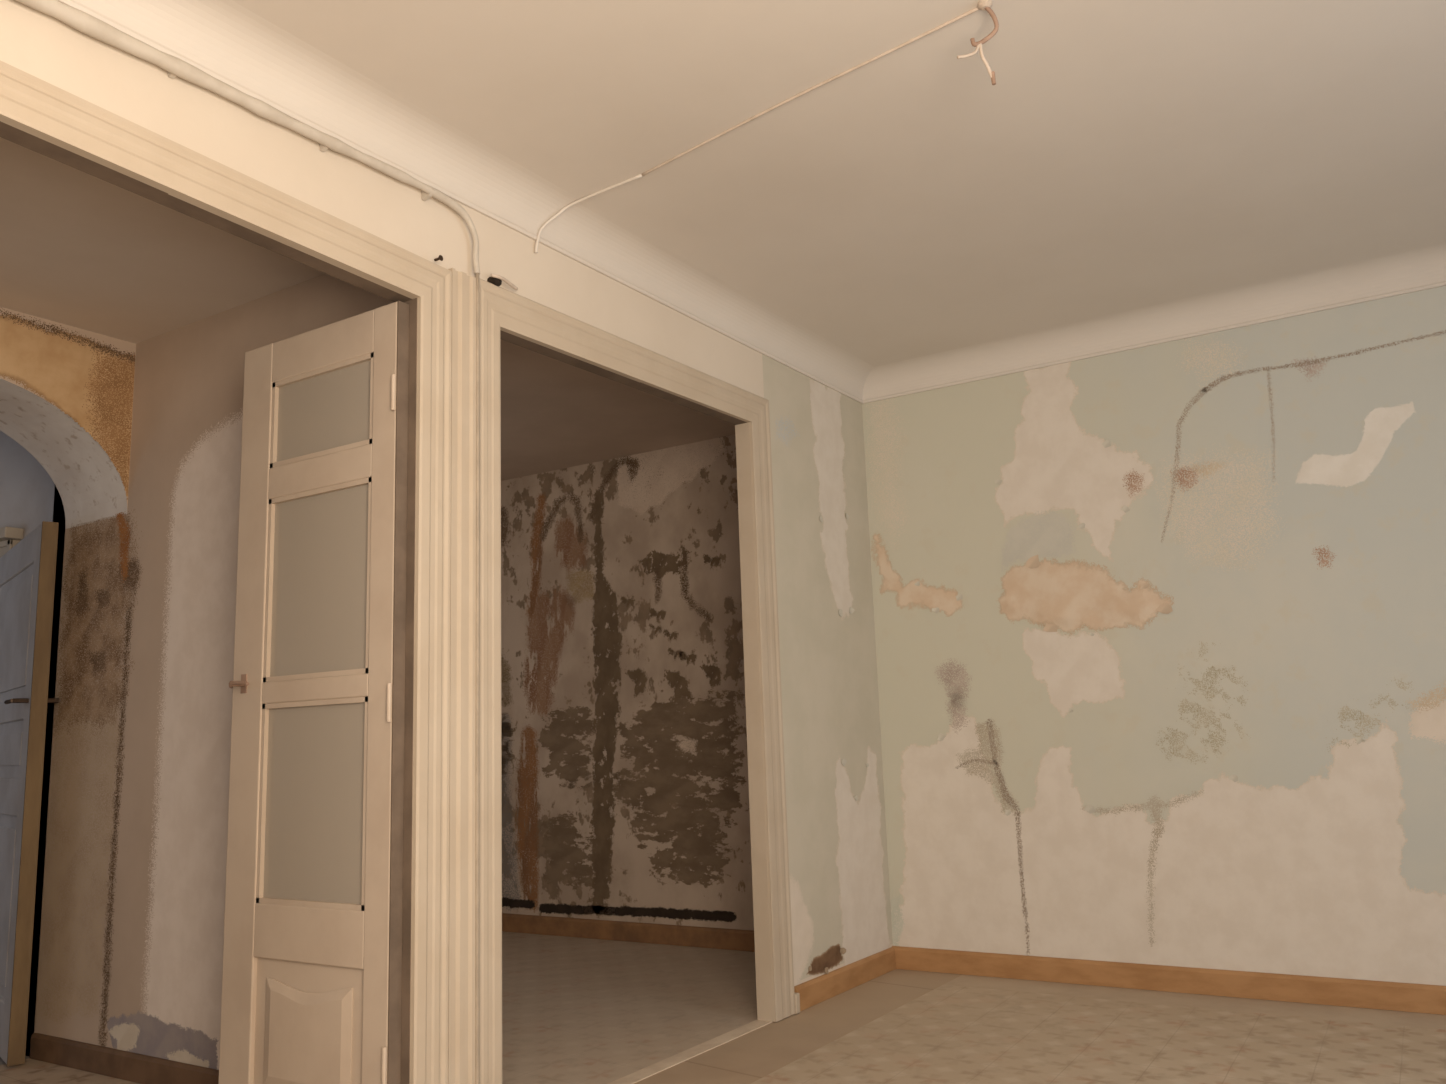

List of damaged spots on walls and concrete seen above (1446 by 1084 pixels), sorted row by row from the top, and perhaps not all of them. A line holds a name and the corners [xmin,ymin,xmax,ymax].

peeling [0,314,135,496]
peeling [809,378,855,621]
peeling [871,533,965,617]
peeling [993,362,1154,562]
peeling [1022,626,1127,719]
flaking render [35,685,218,1069]
crack [955,719,1030,956]
peeling [789,681,1446,986]